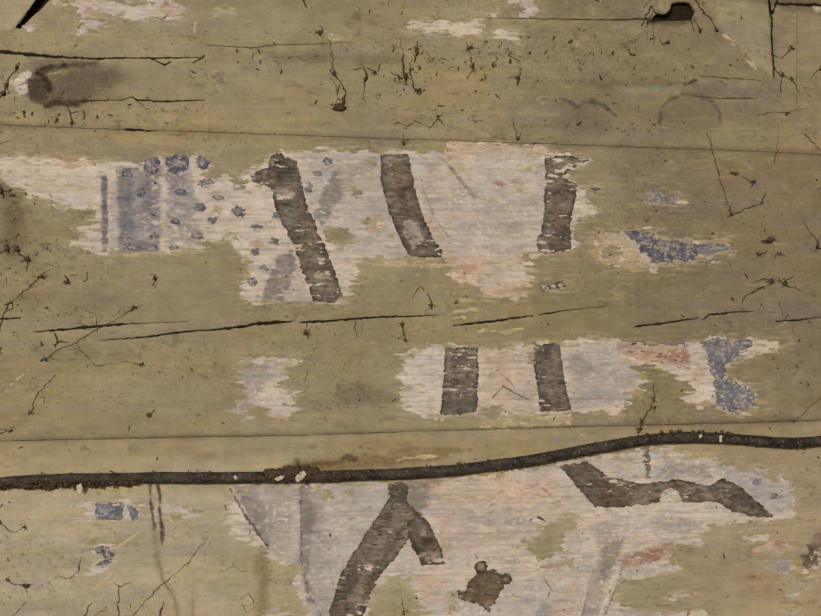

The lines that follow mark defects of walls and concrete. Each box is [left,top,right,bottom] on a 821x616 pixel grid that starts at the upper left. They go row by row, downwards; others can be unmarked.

crack [16,0,49,29]
peeling [52,0,187,37]
crack [0,42,343,66]
water stain [27,62,116,108]
peeling [0,141,733,320]
crack [0,306,606,341]
crack [633,311,752,328]
crack [775,314,820,322]
peeling [232,355,303,421]
peeling [393,328,779,431]
peeling [219,444,821,616]